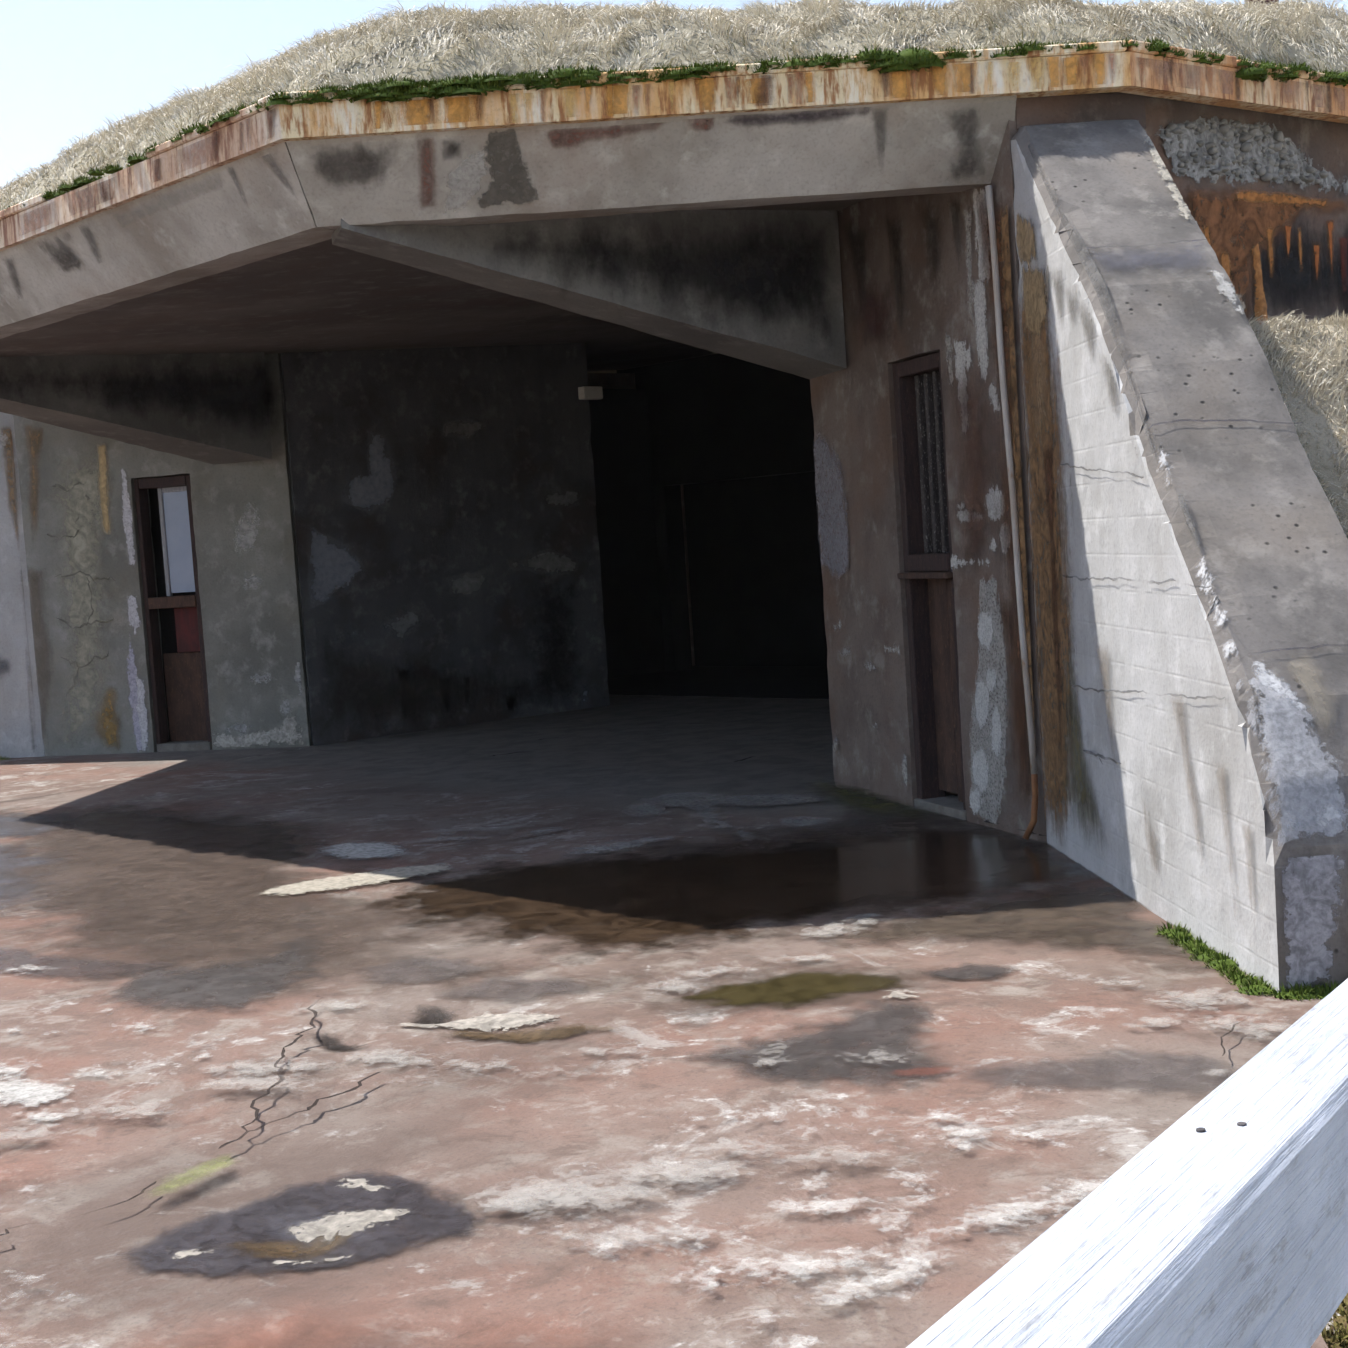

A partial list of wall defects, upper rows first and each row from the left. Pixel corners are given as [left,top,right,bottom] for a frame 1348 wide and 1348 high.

rust [548,84,660,146]
rust [693,75,771,131]
spalling [1144,112,1348,219]
spalling [1214,271,1242,312]
rust [1187,192,1346,319]
rust [979,202,1073,829]
crack [55,571,114,691]
peeling [951,485,1010,823]
spalling [1236,662,1348,988]
damp [0,811,573,1008]
crack [218,1006,382,1149]
crack [110,1181,157,1206]